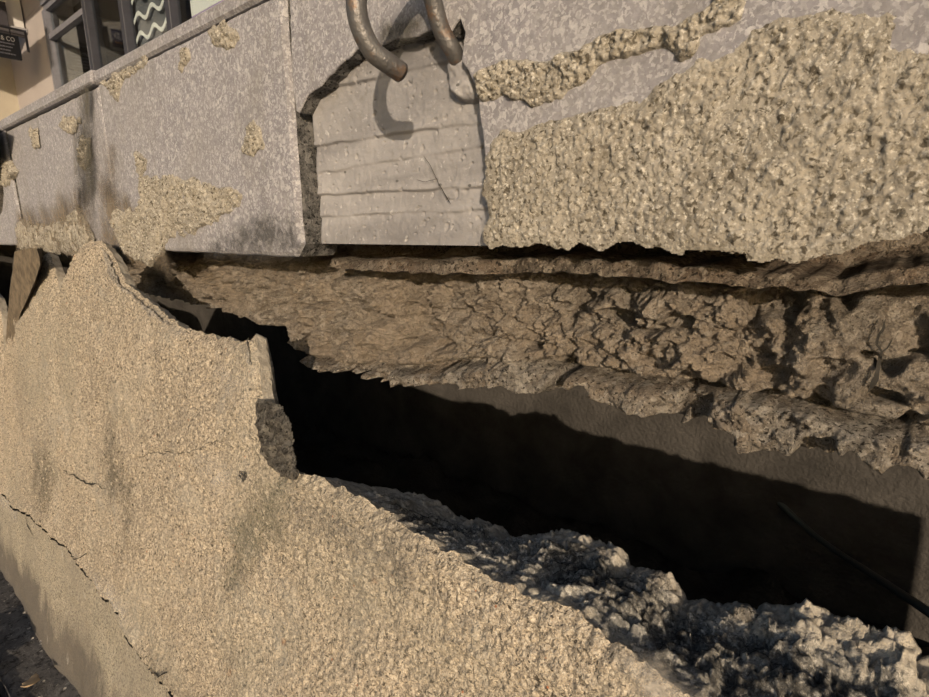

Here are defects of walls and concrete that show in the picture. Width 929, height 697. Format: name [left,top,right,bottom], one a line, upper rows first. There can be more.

spalling [101,40,929,480]
crack [867,319,893,393]
crack [2,494,173,697]